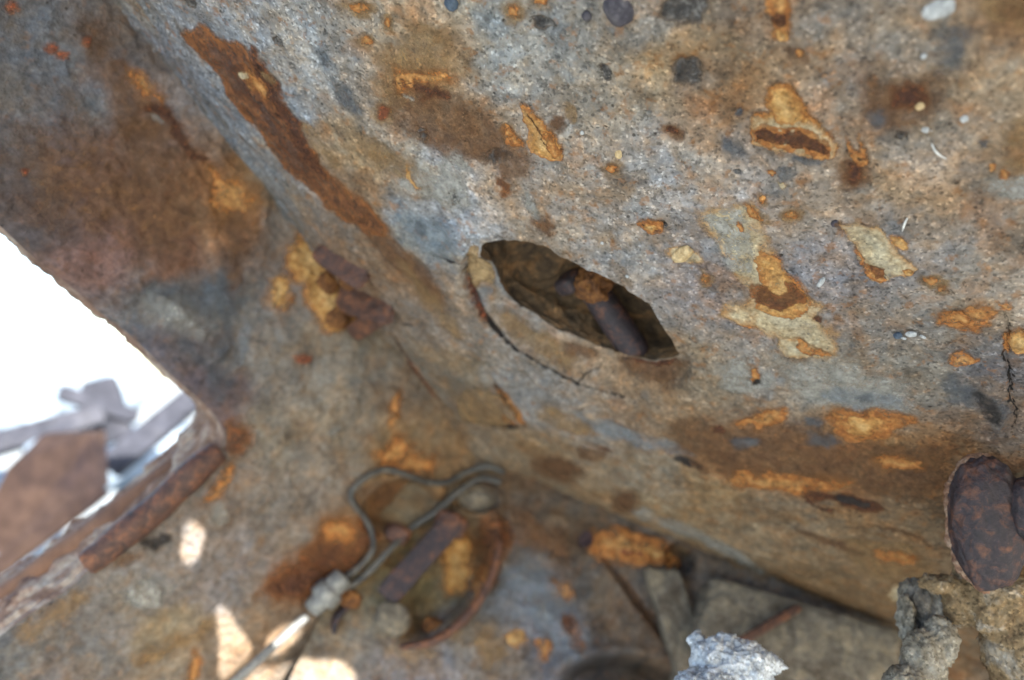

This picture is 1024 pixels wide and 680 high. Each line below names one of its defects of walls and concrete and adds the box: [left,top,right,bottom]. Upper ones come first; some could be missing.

rust [181,23,441,307]
rust [375,28,530,198]
rust [550,116,566,130]
crack [429,254,633,399]
spalling [465,239,619,352]
spalling [612,283,680,360]
rust [936,303,1012,367]
rust [673,407,944,496]
spalling [130,582,161,607]
rust [256,518,380,604]
rust [578,491,681,569]